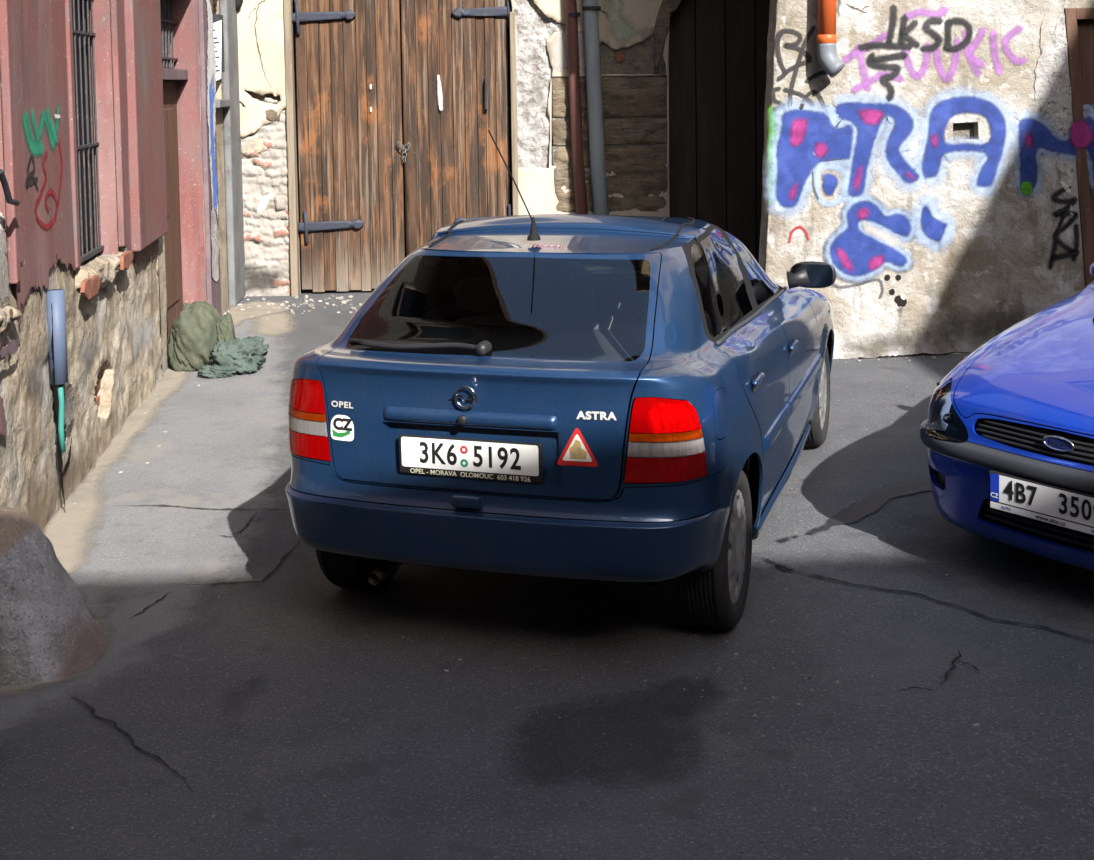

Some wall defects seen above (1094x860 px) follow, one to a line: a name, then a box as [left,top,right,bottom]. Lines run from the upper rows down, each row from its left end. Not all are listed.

crack [247,0,271,90]
flaking render [510,0,566,168]
crack [530,0,565,25]
flaking render [241,91,291,296]
flaking render [0,212,13,319]
flaking render [80,275,101,300]
flaking render [58,382,76,431]